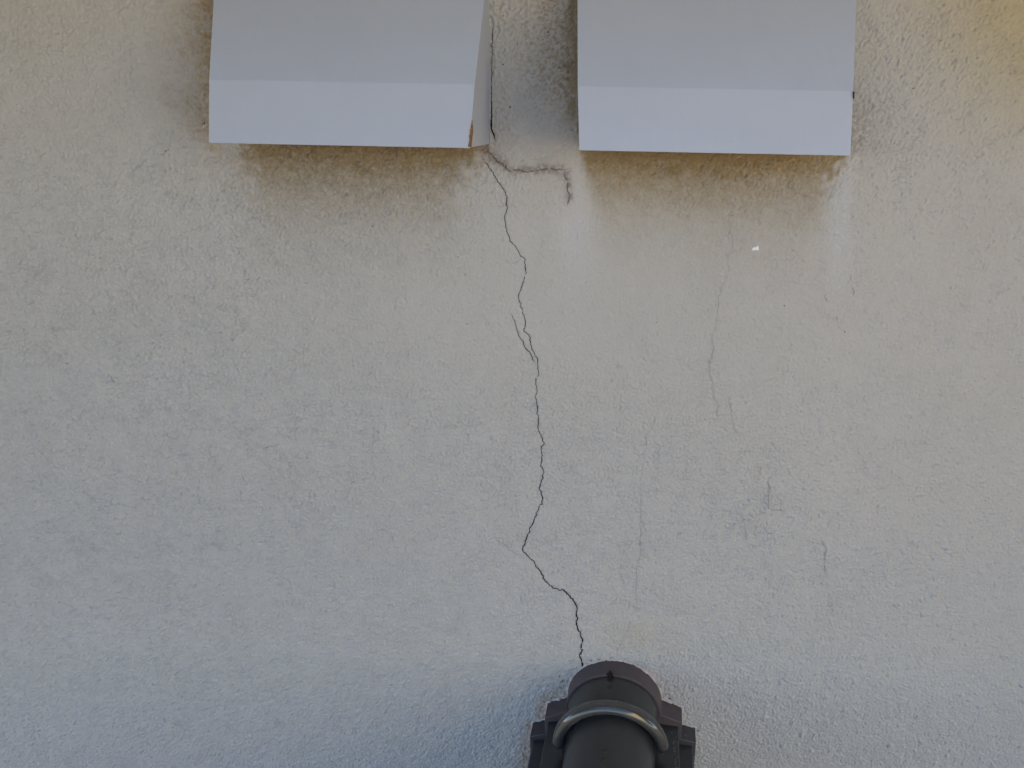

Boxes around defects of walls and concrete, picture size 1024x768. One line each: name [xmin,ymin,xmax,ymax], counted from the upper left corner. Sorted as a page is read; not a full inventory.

crack [482,30,583,667]